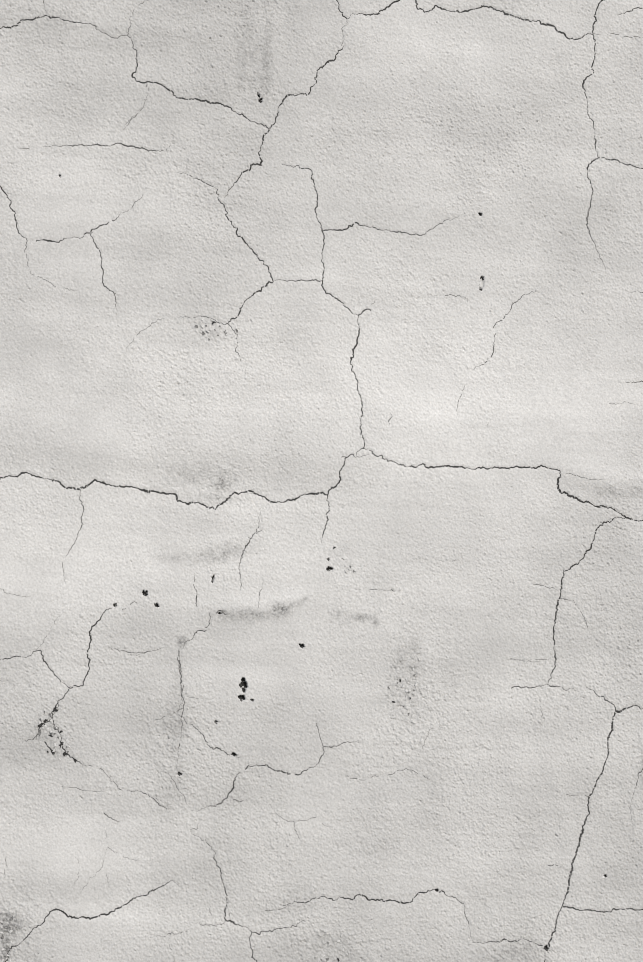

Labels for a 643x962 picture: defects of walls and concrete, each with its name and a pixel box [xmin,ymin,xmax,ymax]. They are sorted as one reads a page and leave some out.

crack [0,0,643,692]
crack [0,601,167,809]
crack [5,880,178,962]
crack [150,573,359,962]
crack [265,689,643,962]